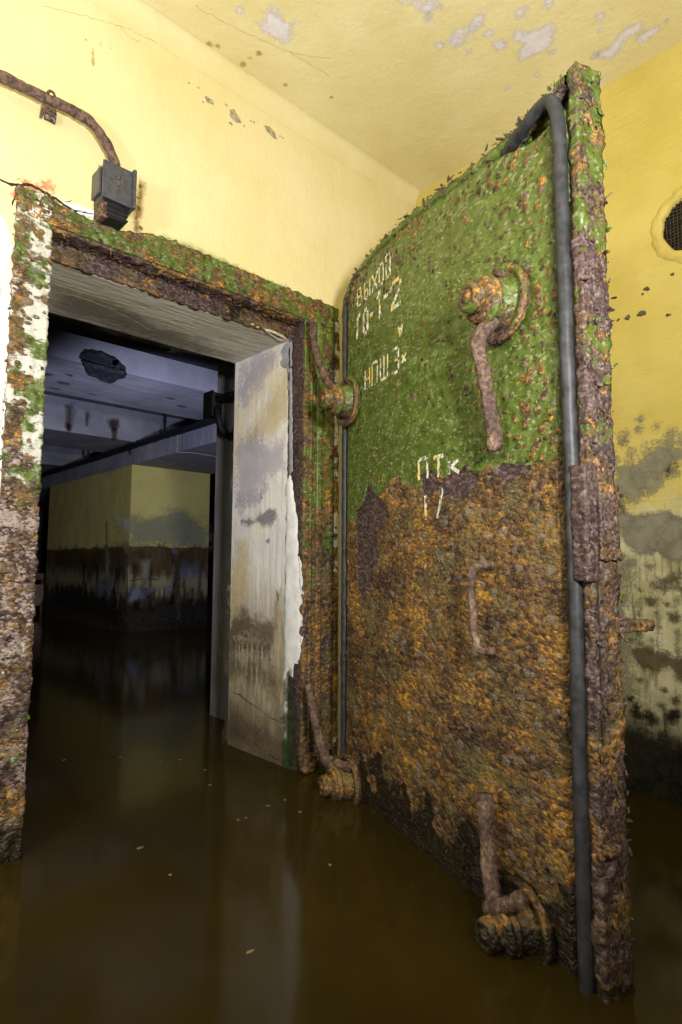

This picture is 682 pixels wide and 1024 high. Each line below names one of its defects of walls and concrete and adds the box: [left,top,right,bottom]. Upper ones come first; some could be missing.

peeling [259,7,298,43]
peeling [436,14,556,61]
peeling [591,19,670,60]
peeling [188,82,284,139]
rust [134,182,143,233]
peeling [581,275,646,341]
peeling [0,190,338,585]
leakage [237,382,287,506]
leakage [615,416,682,504]
leakage [55,522,210,632]
leakage [226,543,286,714]
leakage [619,598,682,805]